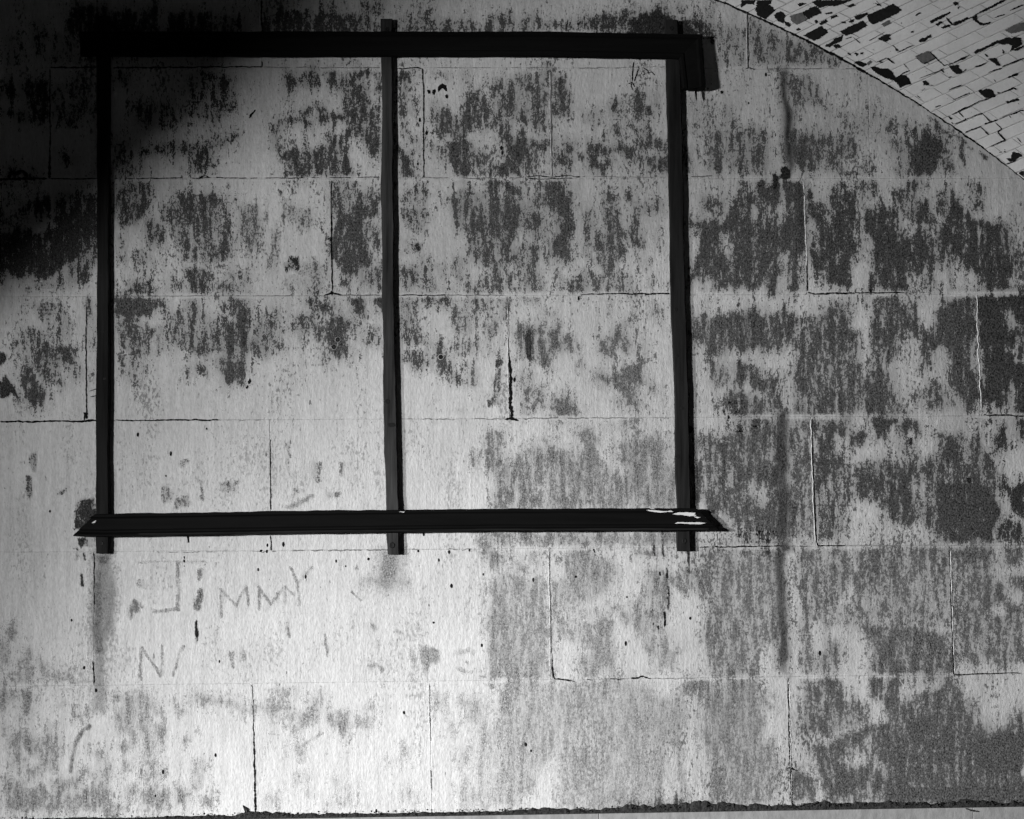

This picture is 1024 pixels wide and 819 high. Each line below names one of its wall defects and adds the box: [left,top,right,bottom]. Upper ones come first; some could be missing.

spalling [741,0,929,91]
peeling [911,0,1006,64]
peeling [973,22,1024,66]
peeling [978,88,1019,103]
peeling [999,151,1024,177]
leakage [0,147,97,417]
crack [0,62,670,421]
leakage [111,57,677,509]
leakage [420,0,1024,811]
leakage [410,645,439,673]